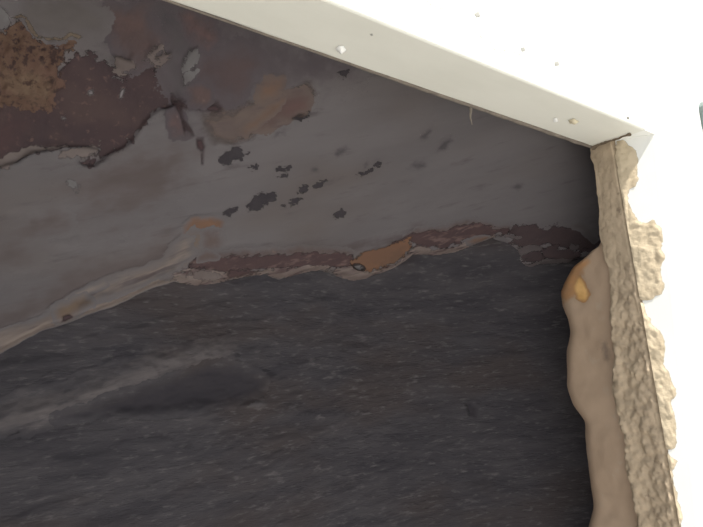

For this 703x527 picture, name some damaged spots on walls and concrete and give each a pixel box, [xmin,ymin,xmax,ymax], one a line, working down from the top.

flaking render [0,0,269,170]
damp [0,13,372,329]
spalling [0,140,683,527]
corrosion [350,237,412,273]